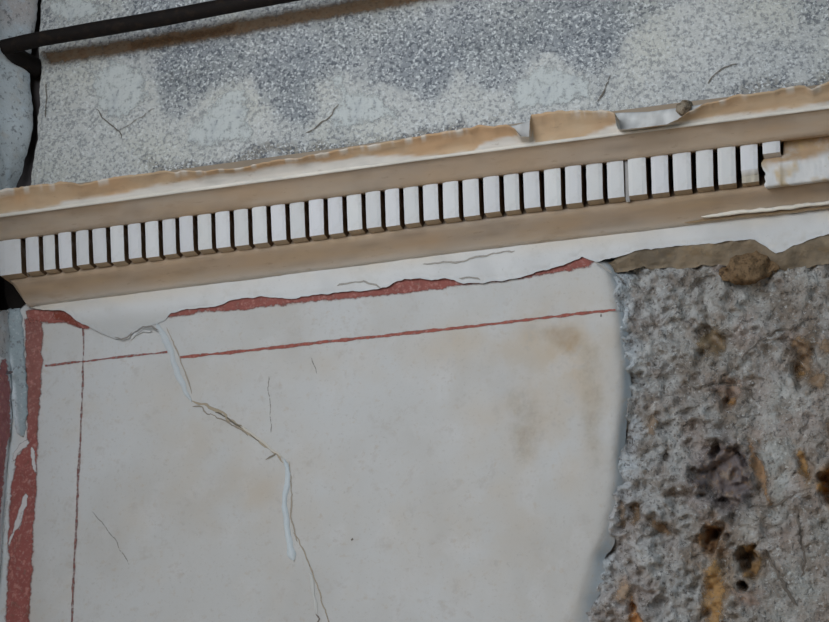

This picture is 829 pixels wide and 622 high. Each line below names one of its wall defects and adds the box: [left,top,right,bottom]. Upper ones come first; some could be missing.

crack [97,108,155,138]
spalling [761,136,829,189]
crack [156,324,329,622]
spalling [586,234,829,622]